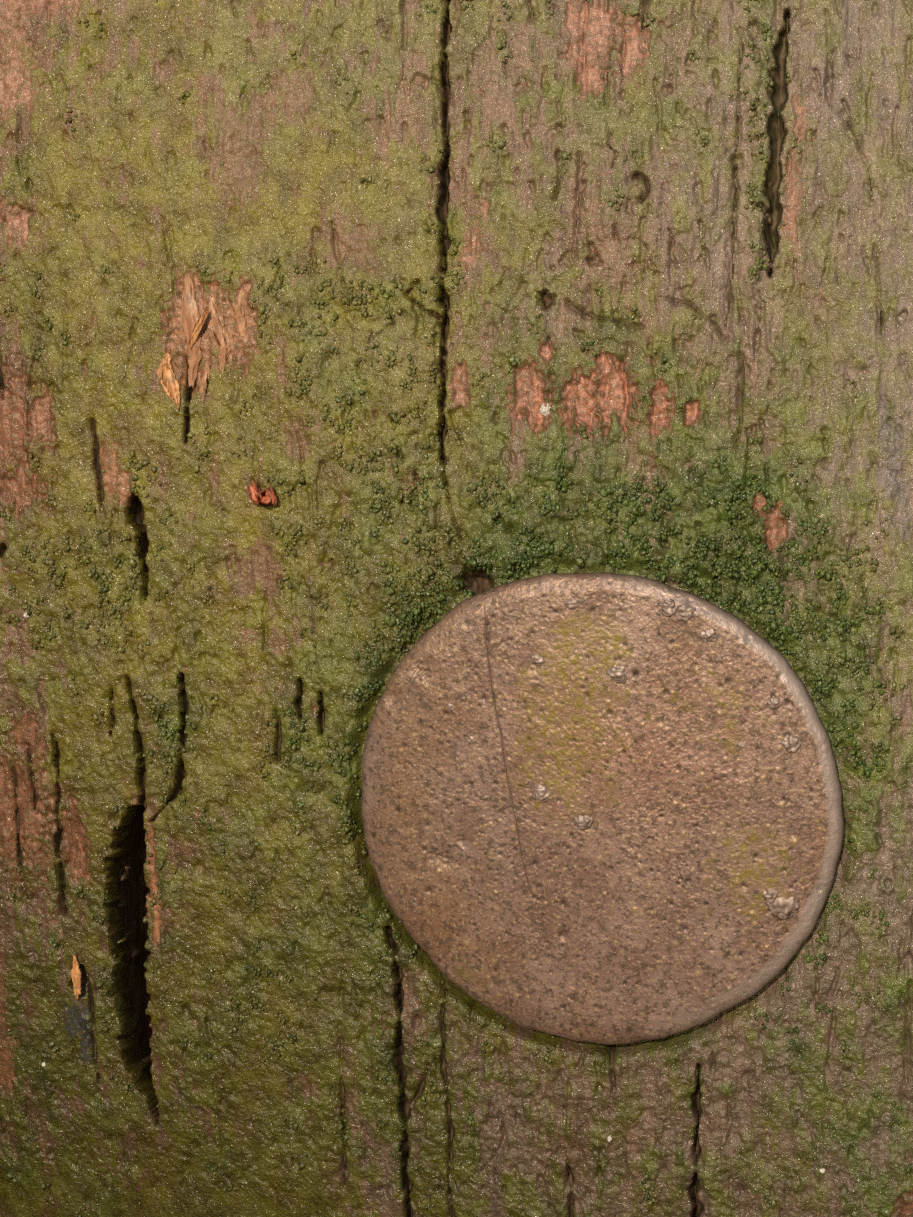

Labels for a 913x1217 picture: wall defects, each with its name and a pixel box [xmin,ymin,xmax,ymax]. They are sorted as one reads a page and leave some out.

crack [0,353,8,394]
peeling [156,270,260,410]
crack [406,0,462,540]
crack [566,302,642,327]
crack [671,13,789,447]
crack [92,420,149,578]
crack [110,673,189,1090]
crack [86,970,100,1083]
crack [386,926,454,1217]
crack [689,1064,703,1217]